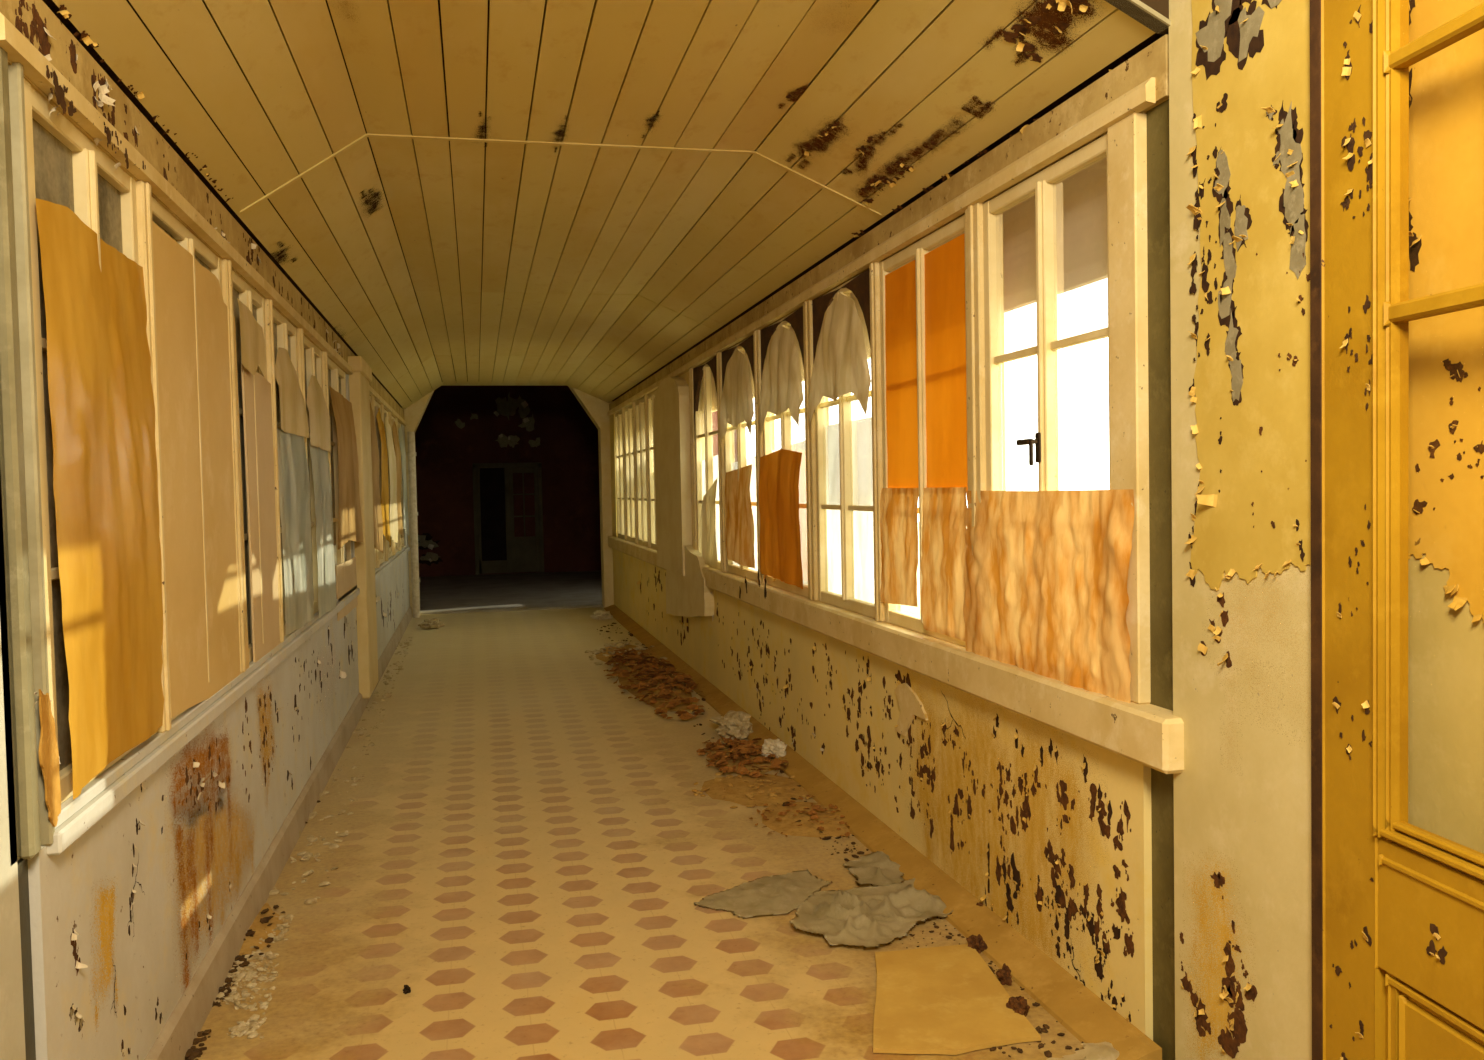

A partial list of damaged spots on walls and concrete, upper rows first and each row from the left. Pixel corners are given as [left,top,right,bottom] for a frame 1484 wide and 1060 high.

peeling [1003,0,1091,63]
peeling [1341,42,1352,80]
peeling [1349,5,1373,33]
peeling [15,0,343,358]
peeling [1341,117,1373,218]
peeling [1184,0,1311,668]
peeling [1340,295,1373,411]
peeling [1348,504,1371,585]
peeling [1332,696,1372,760]
rust [165,718,234,992]
peeling [716,603,1134,1022]
peeling [1350,926,1372,949]